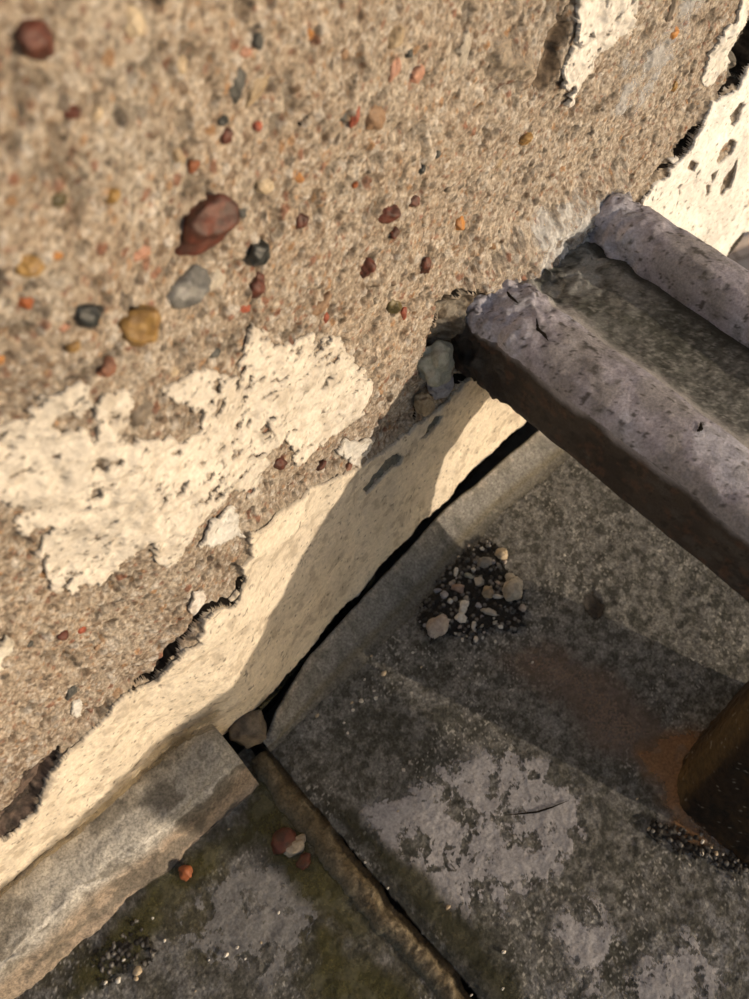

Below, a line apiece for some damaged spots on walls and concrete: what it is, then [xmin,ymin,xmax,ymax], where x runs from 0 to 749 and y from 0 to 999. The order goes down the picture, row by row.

peeling [532,0,639,108]
crack [717,18,749,95]
crack [655,124,701,171]
crack [131,575,244,690]
peeling [0,323,526,890]